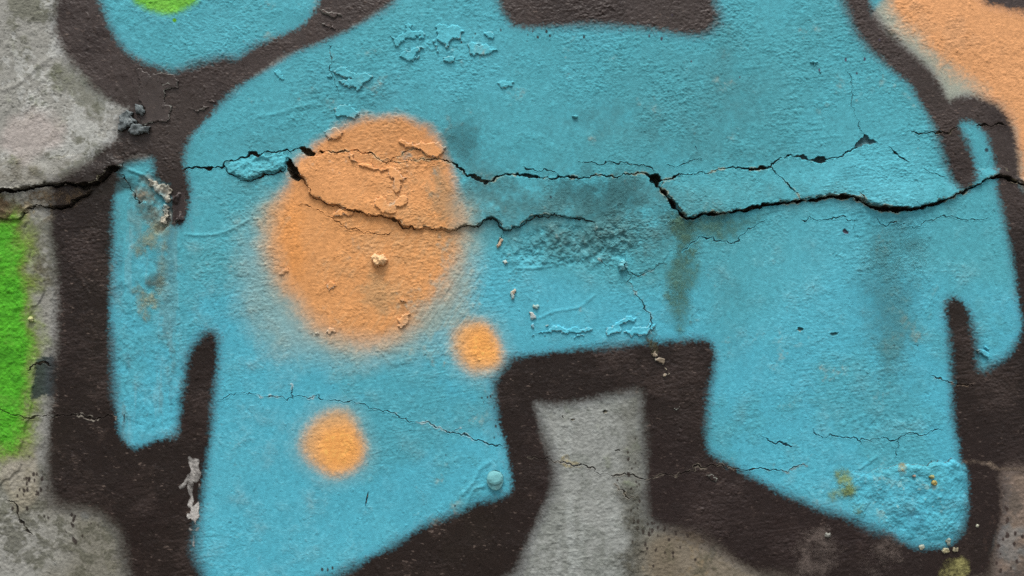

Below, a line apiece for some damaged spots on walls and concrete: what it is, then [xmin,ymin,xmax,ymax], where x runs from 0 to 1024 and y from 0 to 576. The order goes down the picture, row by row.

peeling [391,22,498,63]
peeling [117,64,179,136]
peeling [327,66,373,91]
peeling [399,139,446,158]
crack [0,164,147,222]
flaking render [148,179,188,224]
peeling [349,153,408,215]
crack [183,147,597,249]
crack [325,67,1024,334]
peeling [529,304,593,338]
peeling [606,315,656,337]
crack [216,383,944,501]